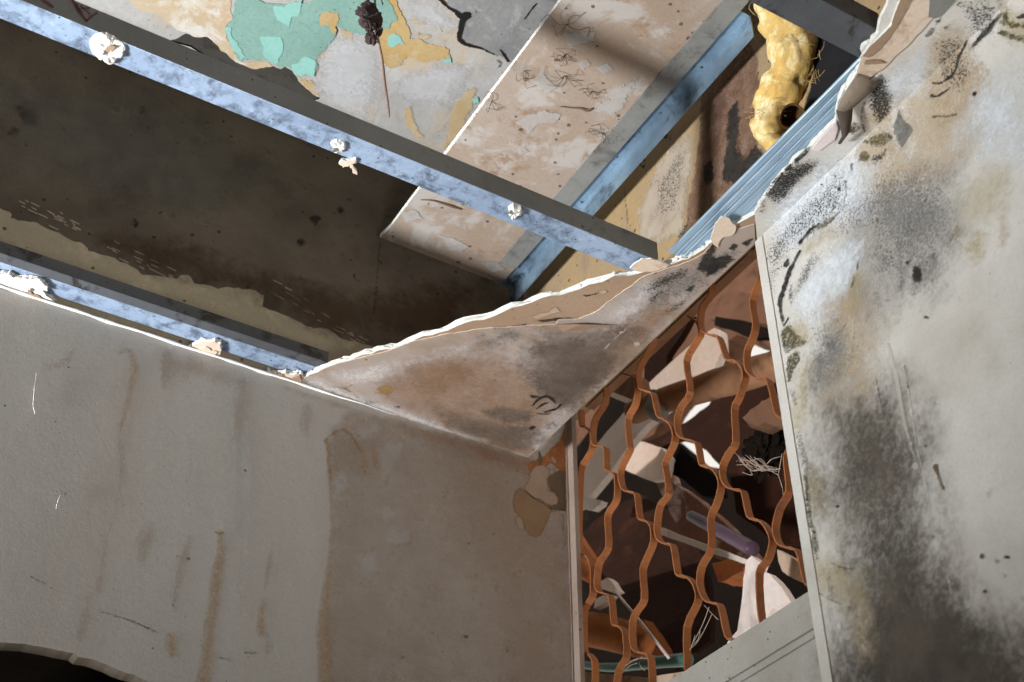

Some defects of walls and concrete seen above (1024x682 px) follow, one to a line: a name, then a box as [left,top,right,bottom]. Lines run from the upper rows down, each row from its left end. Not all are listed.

peeling [128,0,451,97]
crack [439,0,510,68]
peeling [443,88,479,149]
peeling [0,200,374,362]
peeling [220,350,280,372]
peeling [513,307,570,326]
water stain [759,0,1024,682]
peeling [513,464,566,549]